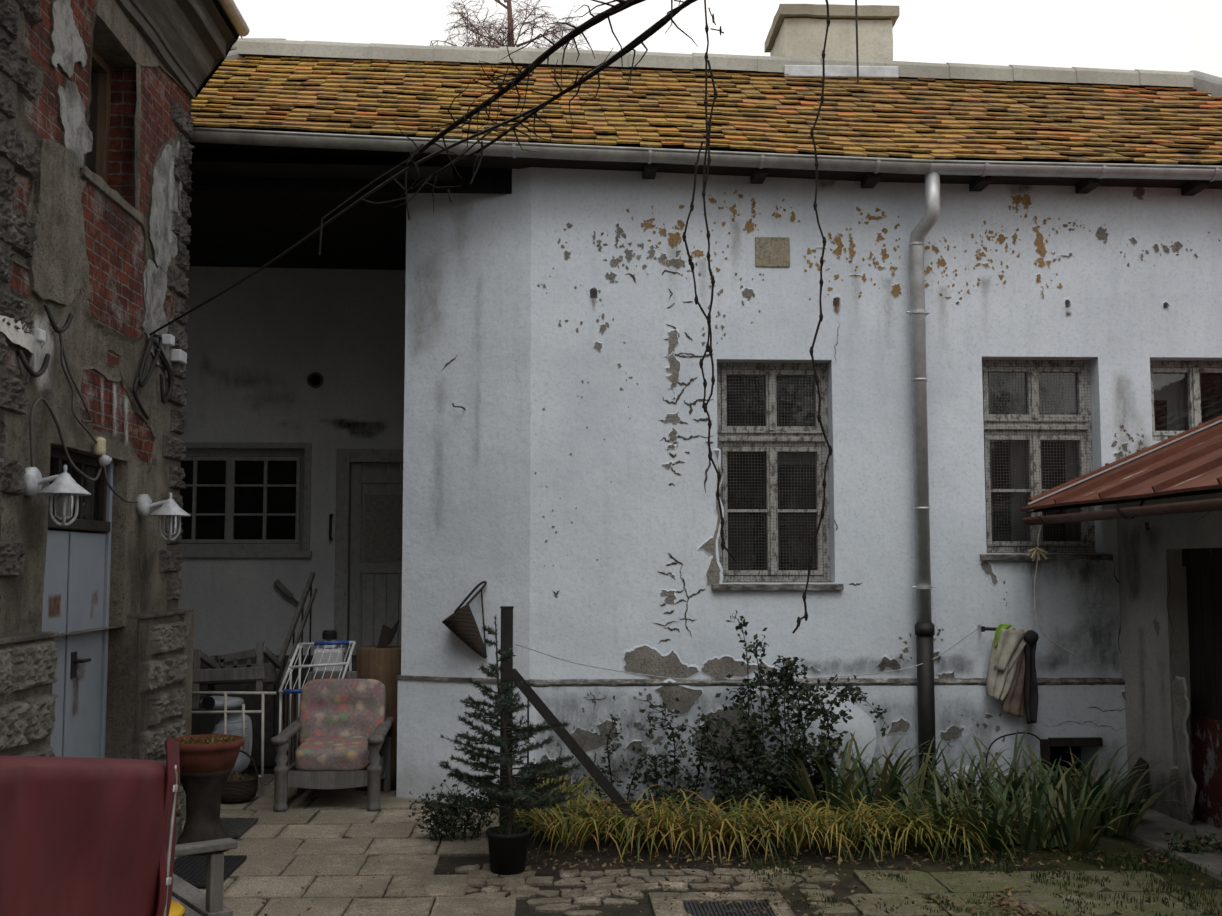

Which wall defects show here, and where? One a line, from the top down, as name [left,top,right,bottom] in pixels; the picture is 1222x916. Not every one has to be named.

spalling [13,0,192,470]
peeling [558,190,800,353]
peeling [804,207,903,310]
peeling [924,193,1110,311]
peeling [1120,236,1198,267]
crack [625,270,714,493]
spalling [697,448,724,587]
crack [652,553,706,644]
spalling [875,633,912,672]
spalling [524,644,774,789]
spalling [885,715,912,736]